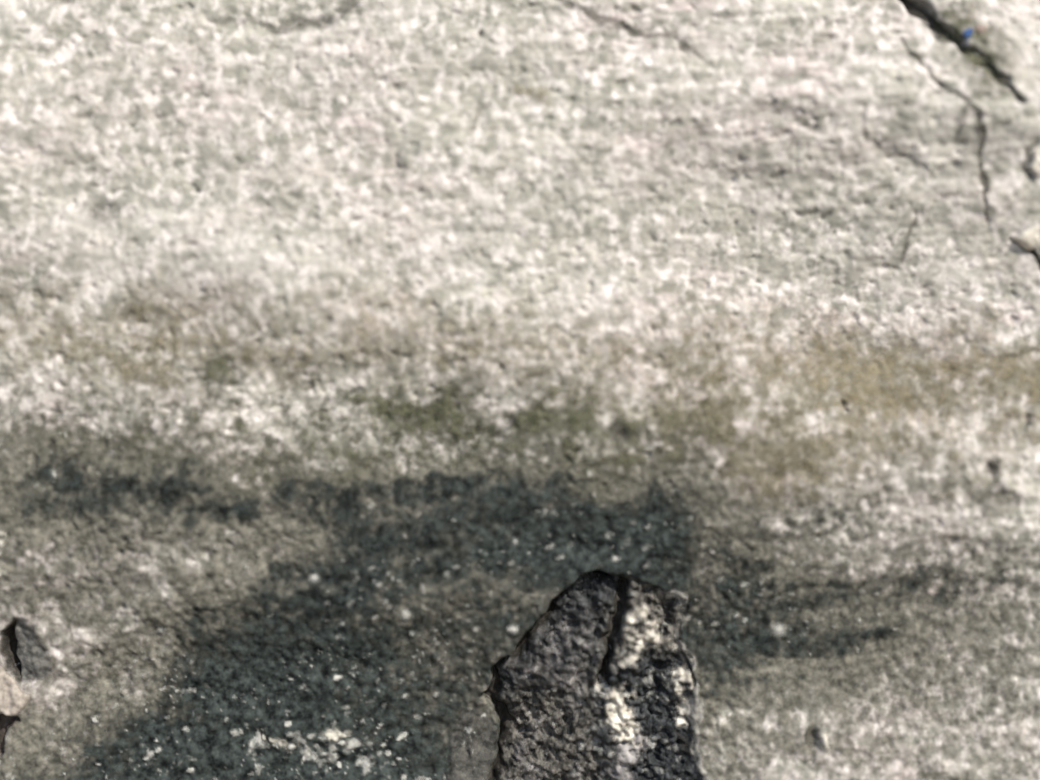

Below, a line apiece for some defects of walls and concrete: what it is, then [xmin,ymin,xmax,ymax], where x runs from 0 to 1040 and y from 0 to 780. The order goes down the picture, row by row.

crack [898,0,1027,216]
crack [1012,225,1040,268]
crack [1022,145,1040,177]
crack [0,616,51,763]
water stain [0,402,1040,780]
spalling [450,569,711,780]